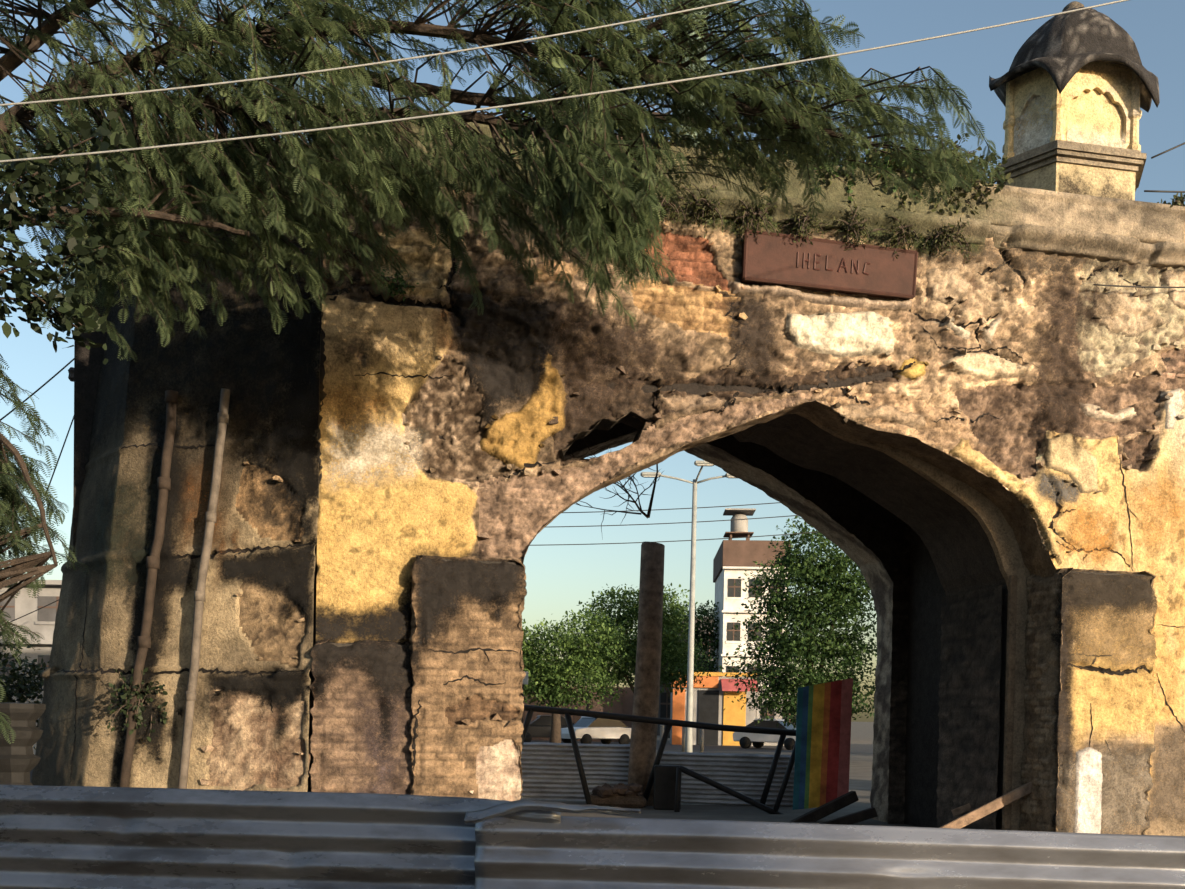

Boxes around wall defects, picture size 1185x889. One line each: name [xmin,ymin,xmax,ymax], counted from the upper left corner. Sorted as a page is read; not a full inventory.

crack [174,542,313,559]
leakage [89,194,590,794]
crack [318,254,463,484]
spalling [402,253,1185,566]
leakage [919,241,1185,453]
crack [1044,435,1138,571]
crack [57,580,304,782]
spalling [445,695,522,801]
leakage [1050,568,1156,832]
crack [1068,654,1185,731]
leakage [1097,727,1185,834]